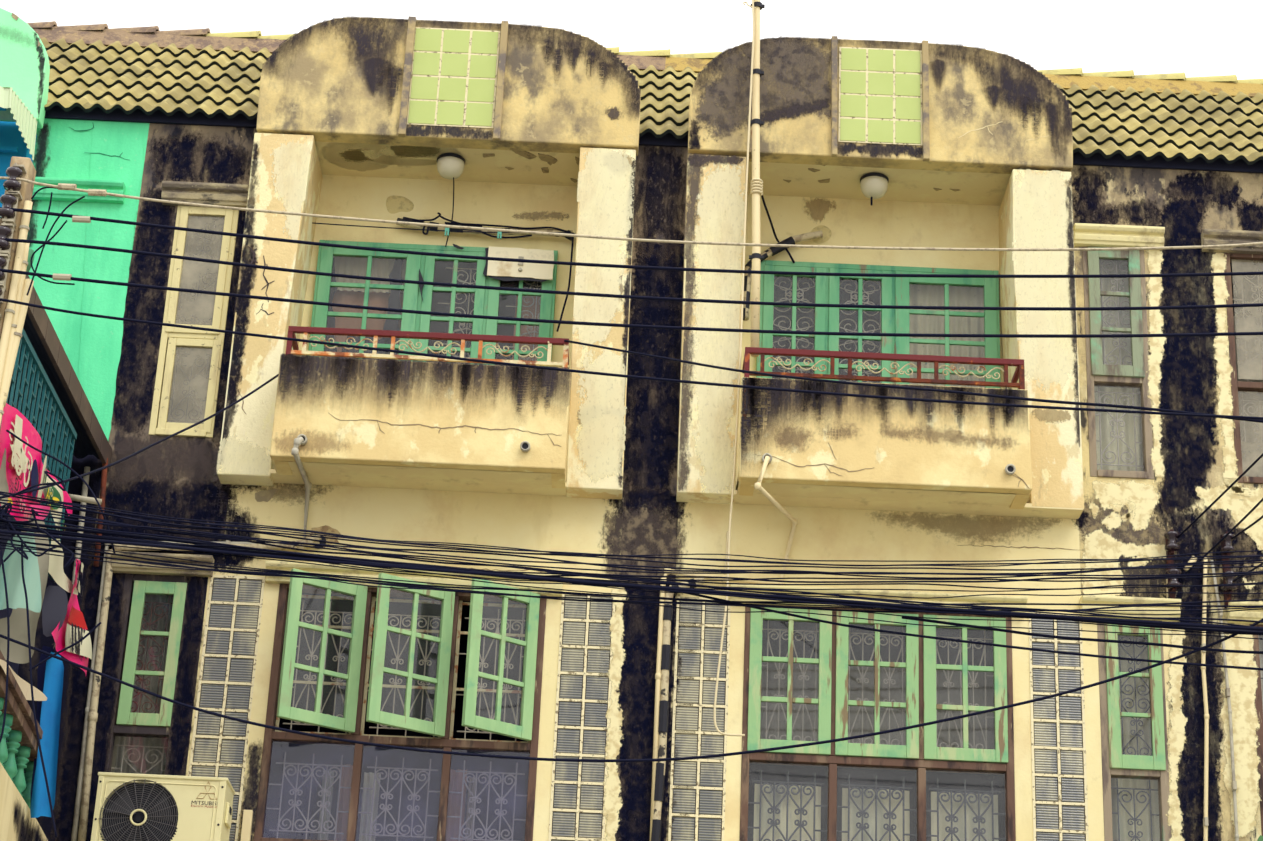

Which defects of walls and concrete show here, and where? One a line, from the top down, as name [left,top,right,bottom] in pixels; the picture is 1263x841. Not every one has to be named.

water stain [264,16,641,120]
water stain [837,142,923,158]
water stain [14,131,321,841]
water stain [278,354,572,408]
water stain [602,36,845,841]
water stain [740,377,1028,457]
water stain [1066,168,1263,841]